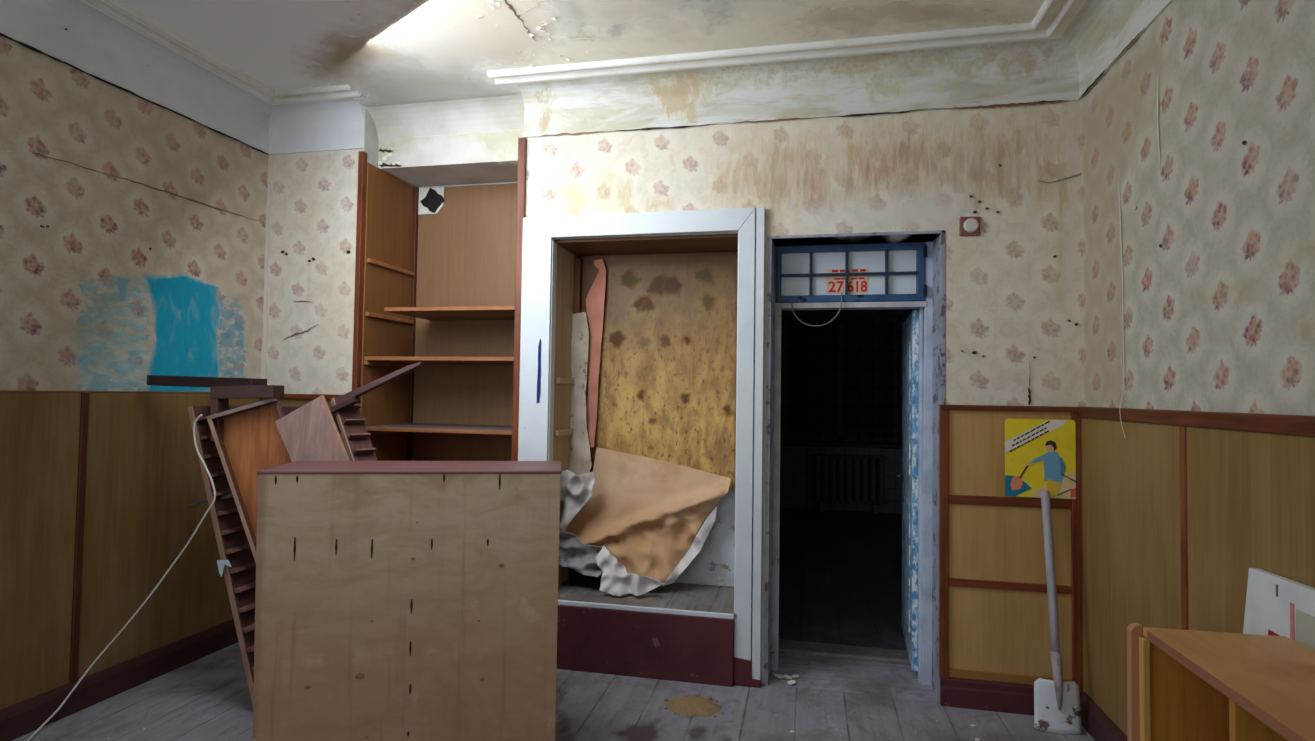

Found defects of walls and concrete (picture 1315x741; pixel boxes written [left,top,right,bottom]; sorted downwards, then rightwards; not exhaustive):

crack [504,0,545,39]
damp [321,41,405,74]